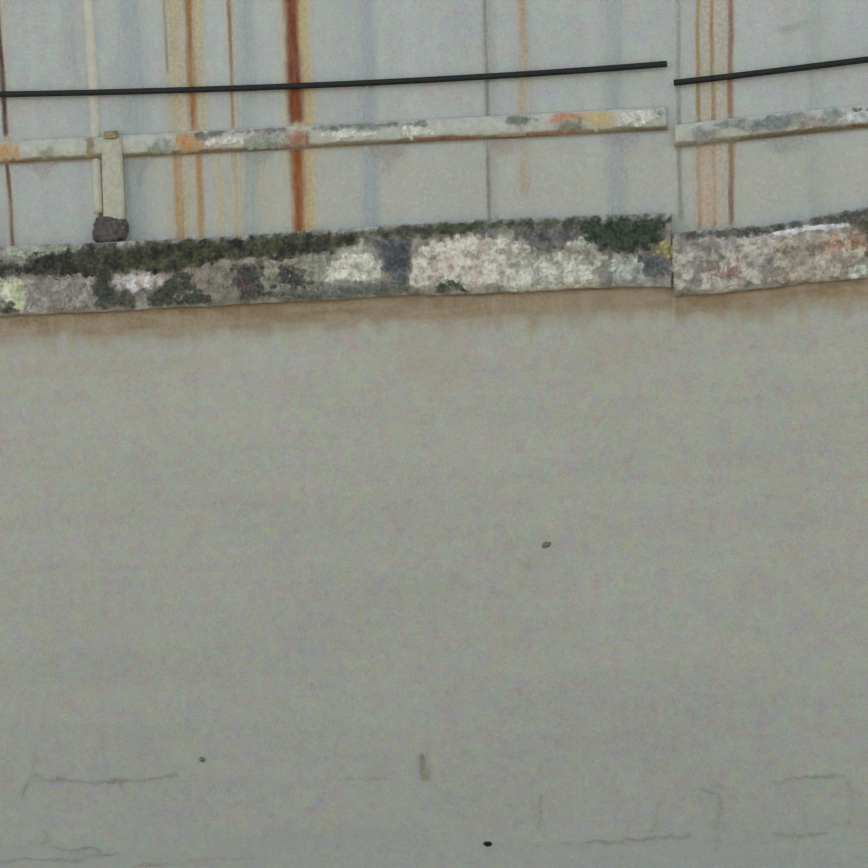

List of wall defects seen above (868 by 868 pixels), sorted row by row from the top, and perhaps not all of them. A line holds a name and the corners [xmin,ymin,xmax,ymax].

rust [0,0,103,246]
rust [122,0,681,239]
rust [696,0,734,122]
rust [675,122,868,228]
damp [0,278,868,340]